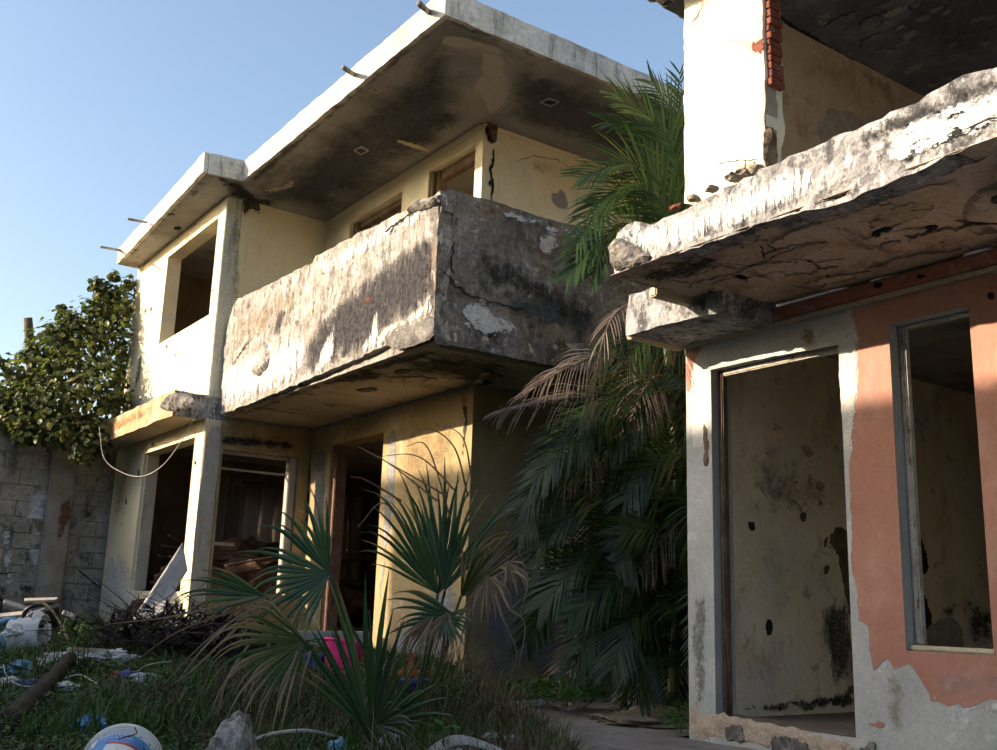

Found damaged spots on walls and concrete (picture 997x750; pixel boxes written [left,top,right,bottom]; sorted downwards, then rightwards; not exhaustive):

flaking render [730,0,785,92]
crack [947,117,997,135]
crack [488,149,574,200]
leakage [306,236,432,371]
crack [441,242,529,311]
leakage [462,303,516,336]
leakage [503,211,590,255]
spalling [608,230,650,271]
flaking render [660,182,997,303]
peeling [686,273,997,714]
mould [744,601,854,711]
spalling [689,704,876,750]